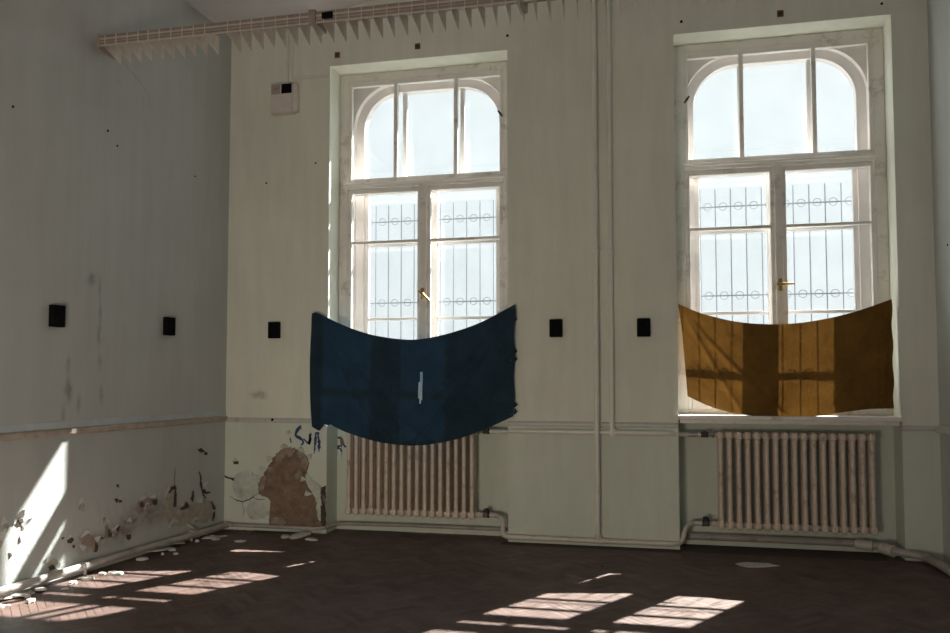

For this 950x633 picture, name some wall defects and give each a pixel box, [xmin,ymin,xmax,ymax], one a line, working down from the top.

spalling [252,444,326,528]
peeling [0,510,32,559]
peeling [61,471,216,552]
peeling [46,554,61,571]
flaking render [2,587,47,597]